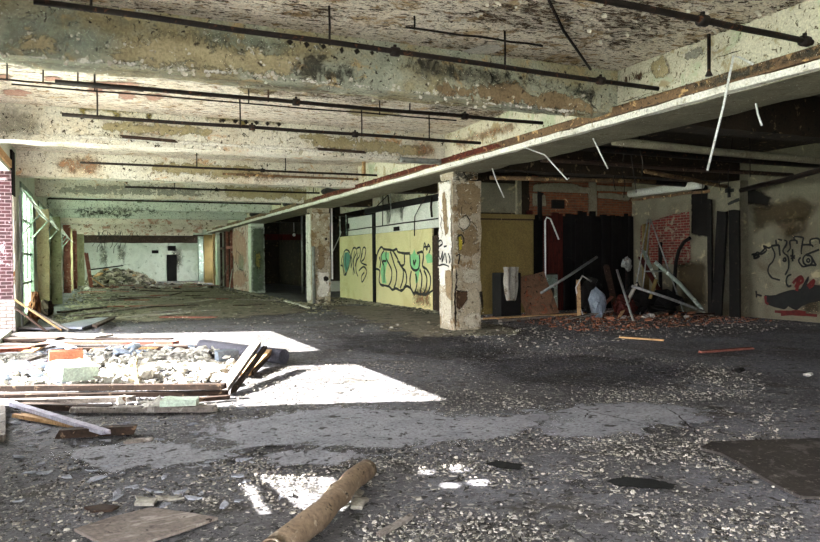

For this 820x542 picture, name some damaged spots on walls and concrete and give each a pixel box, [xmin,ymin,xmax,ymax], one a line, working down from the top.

peeling [445,0,710,52]
peeling [0,27,603,127]
water stain [294,52,364,85]
corrosion [694,46,820,88]
peeling [59,160,306,202]
flaking render [442,178,481,257]
water stain [753,198,812,236]
peeling [438,265,468,315]